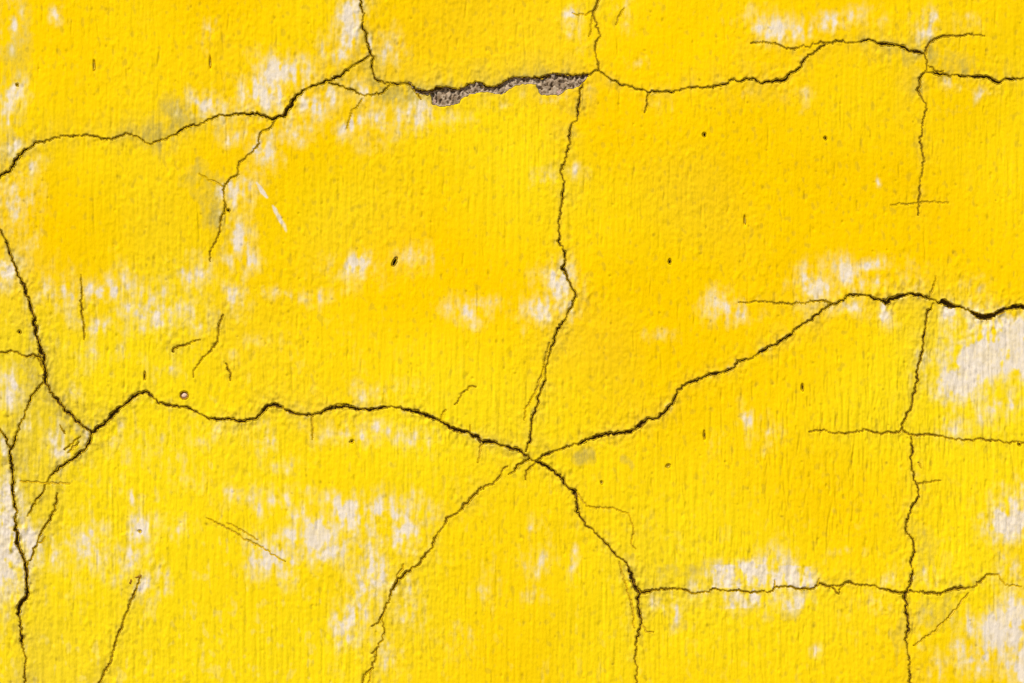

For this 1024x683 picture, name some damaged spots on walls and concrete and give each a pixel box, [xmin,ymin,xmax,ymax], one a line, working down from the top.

crack [0,0,421,261]
peeling [0,0,596,683]
crack [0,229,1024,683]
crack [523,82,583,452]
peeling [608,0,636,38]
crack [572,0,1024,215]